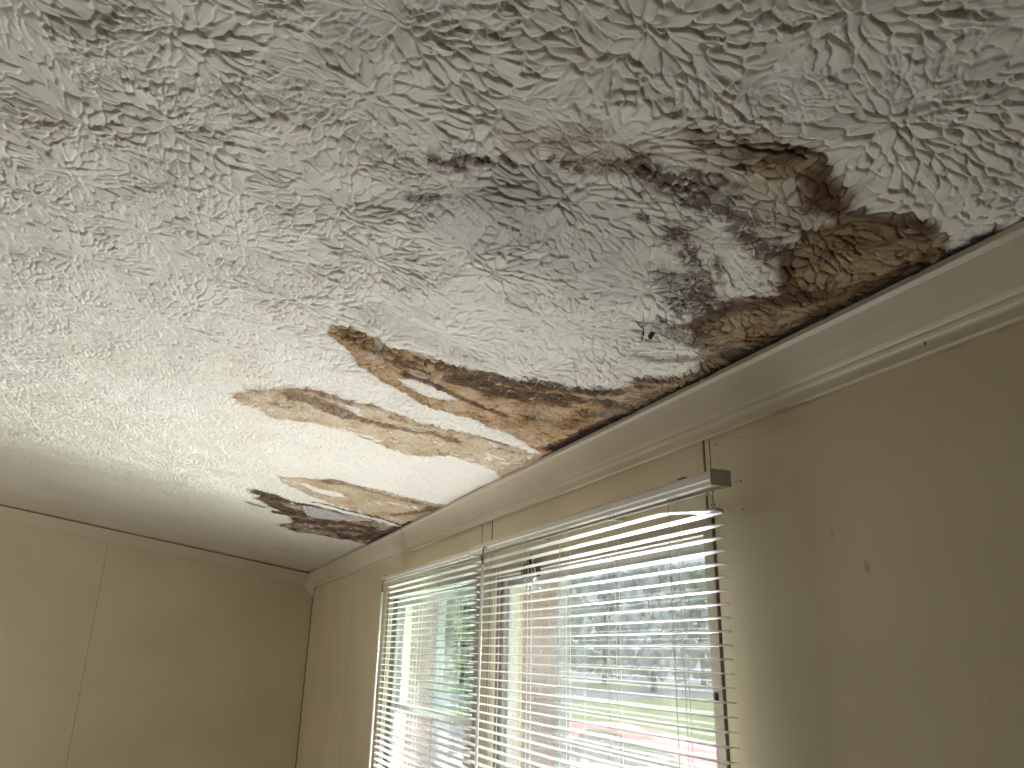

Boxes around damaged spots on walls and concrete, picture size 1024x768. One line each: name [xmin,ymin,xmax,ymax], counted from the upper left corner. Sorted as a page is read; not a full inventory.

leakage [233,132,999,477]
peeling [649,261,735,341]